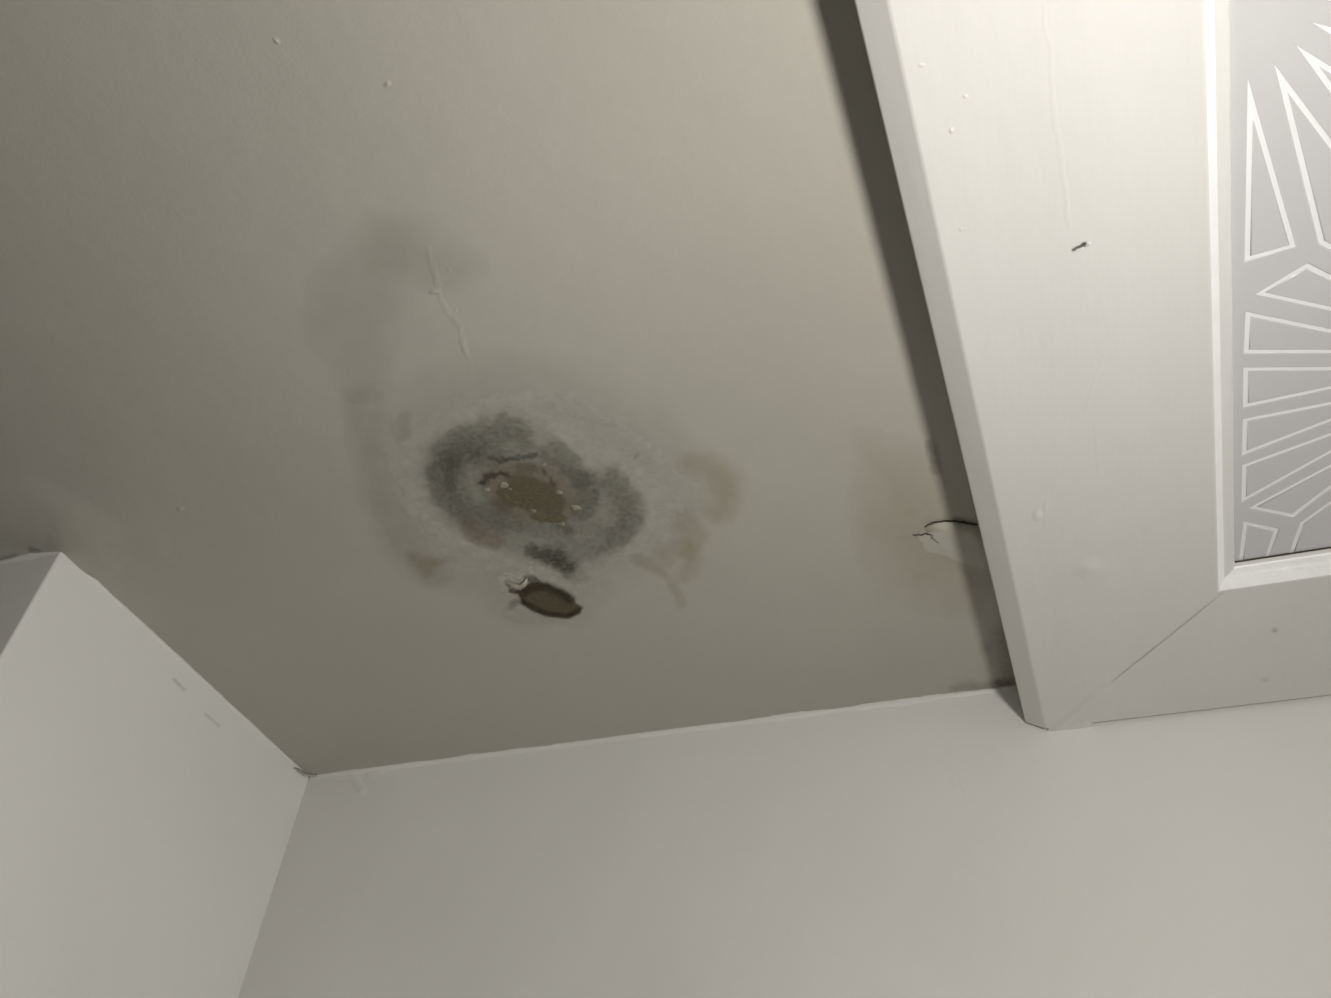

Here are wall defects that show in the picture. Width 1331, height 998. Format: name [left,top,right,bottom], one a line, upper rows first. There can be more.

leakage [397,430,630,572]
spalling [503,564,582,618]